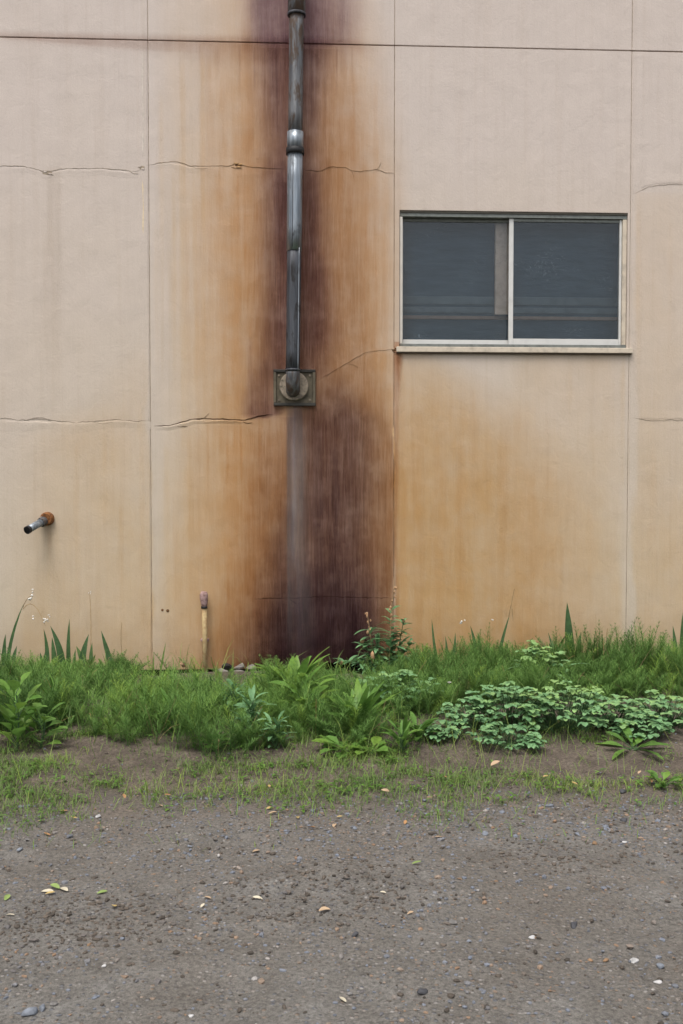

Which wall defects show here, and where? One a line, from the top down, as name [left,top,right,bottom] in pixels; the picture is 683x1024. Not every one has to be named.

crack [0,161,280,178]
crack [307,163,391,178]
crack [0,414,269,434]